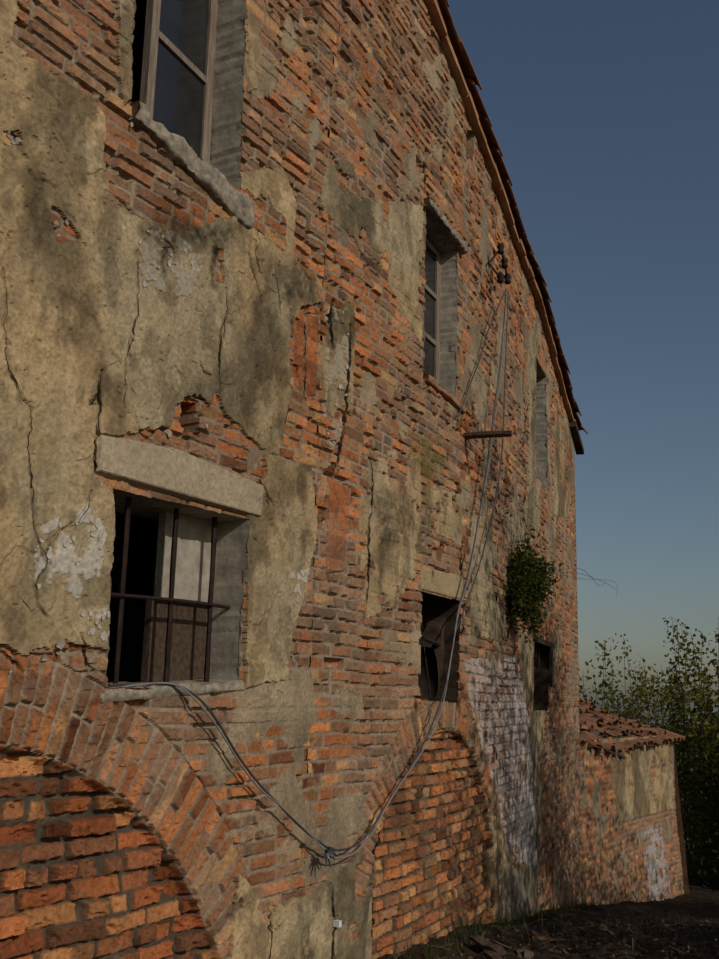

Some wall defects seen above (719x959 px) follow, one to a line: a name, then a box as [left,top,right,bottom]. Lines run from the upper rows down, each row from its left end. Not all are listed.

spalling [103,106,225,297]
crack [3,251,174,614]
spalling [148,391,269,482]
crack [200,291,235,391]
peeling [321,301,352,452]
peeling [291,568,310,606]